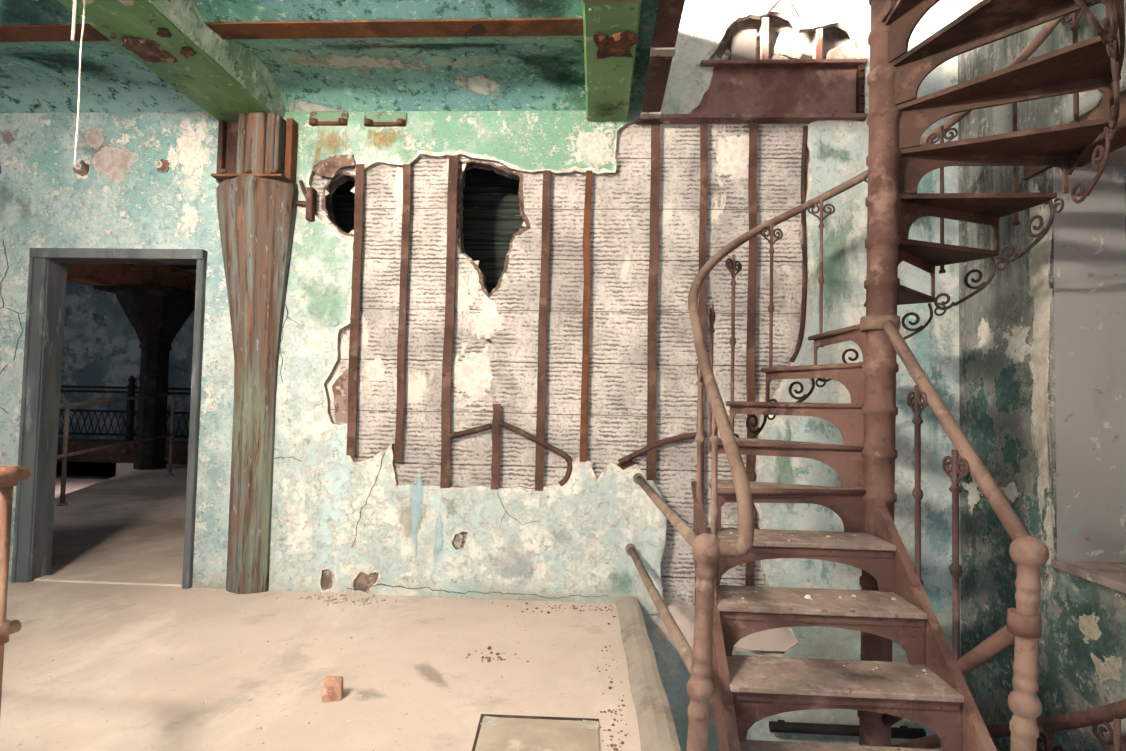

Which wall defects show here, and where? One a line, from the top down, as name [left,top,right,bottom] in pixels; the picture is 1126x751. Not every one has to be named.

peeling [84,127,143,186]
crack [0,240,25,374]
flaking render [306,0,869,605]
flaking render [733,627,799,657]
peeling [1079,612,1122,683]